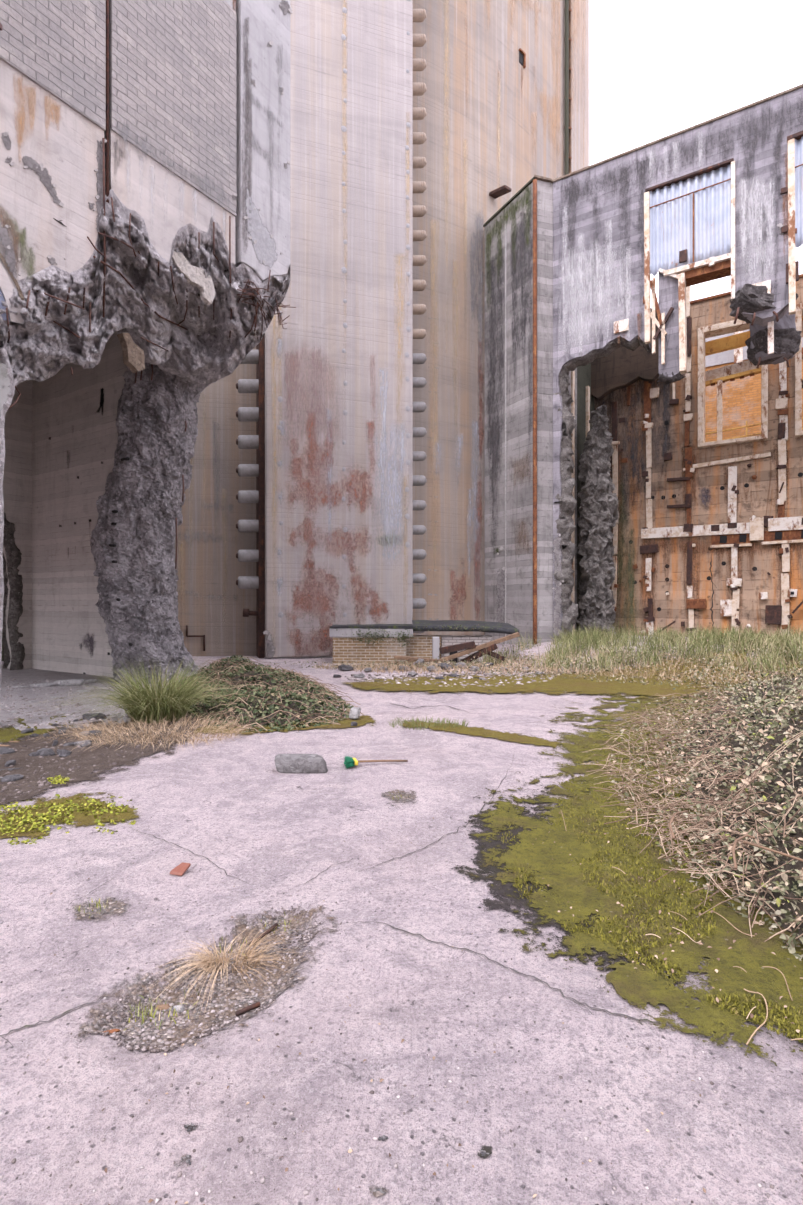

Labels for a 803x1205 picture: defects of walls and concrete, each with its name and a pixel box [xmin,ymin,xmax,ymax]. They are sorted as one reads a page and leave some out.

water stain [0,209,31,258]
spalling [0,132,296,691]
corrosion [289,414,372,654]
water stain [454,189,533,561]
spalling [552,336,652,642]
water stain [563,99,803,343]
spalling [729,283,802,369]
crack [0,986,125,1046]
crack [354,921,755,1054]